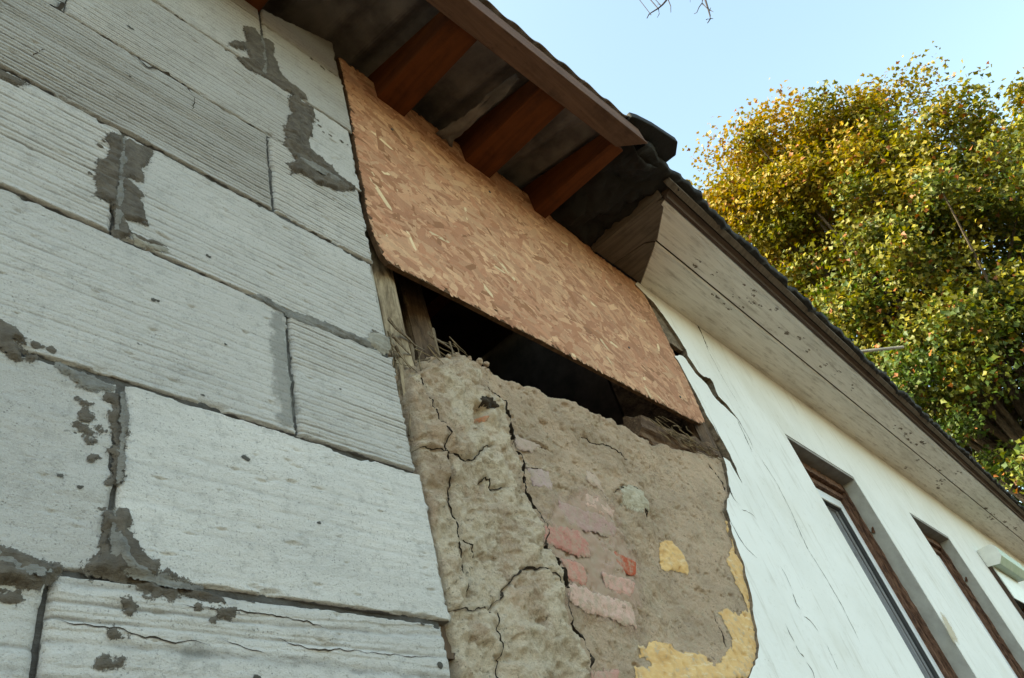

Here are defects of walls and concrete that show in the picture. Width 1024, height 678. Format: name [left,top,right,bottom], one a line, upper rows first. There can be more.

crack [56,604,430,657]
crack [411,378,595,678]
flaking render [514,434,541,453]
flaking render [526,466,642,629]
peeling [634,521,756,678]
crack [698,326,856,633]